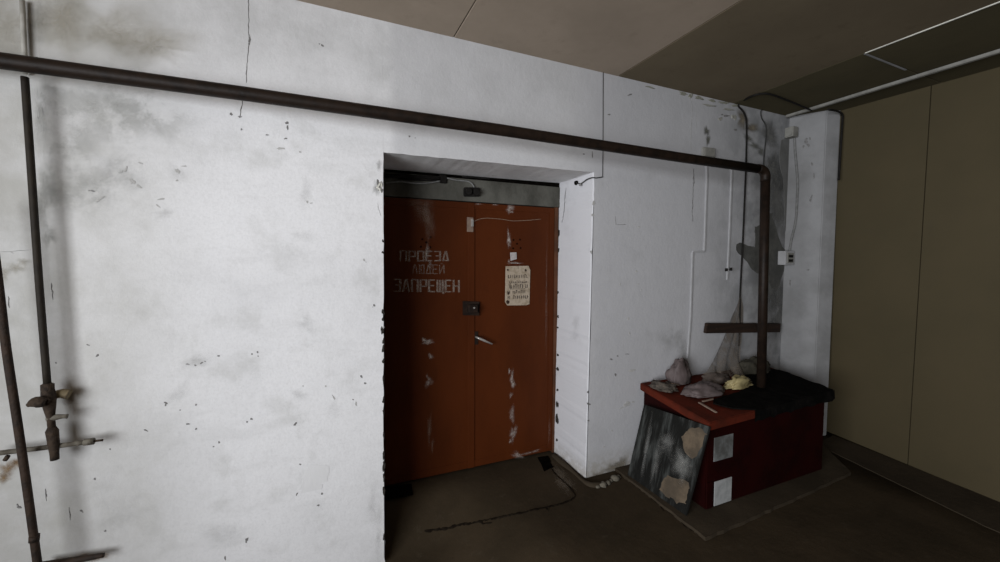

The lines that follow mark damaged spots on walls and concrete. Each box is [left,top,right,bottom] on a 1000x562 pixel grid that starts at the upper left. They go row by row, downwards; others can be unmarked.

crack [238,0,250,117]
damp [739,113,784,222]
damp [768,281,783,336]